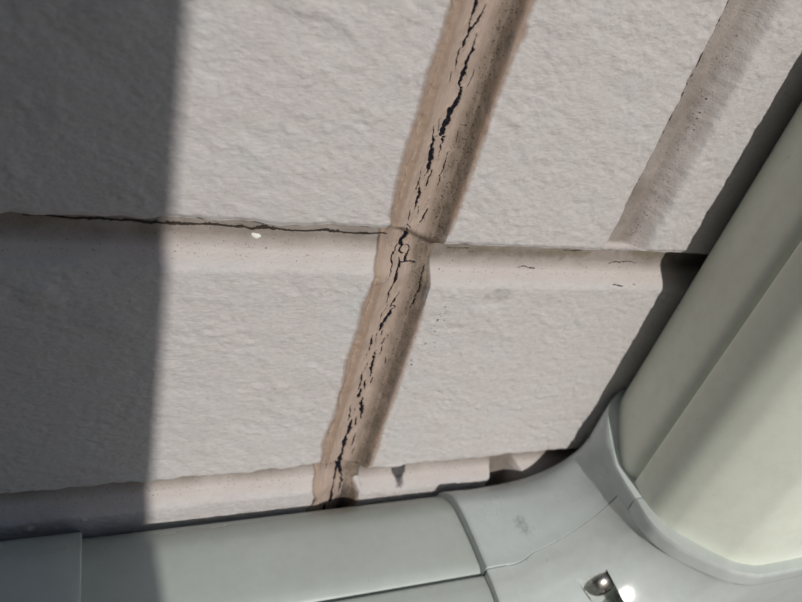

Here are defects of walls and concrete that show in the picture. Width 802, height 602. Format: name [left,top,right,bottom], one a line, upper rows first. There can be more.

leakage [392,465,405,485]
crack [322,0,486,510]